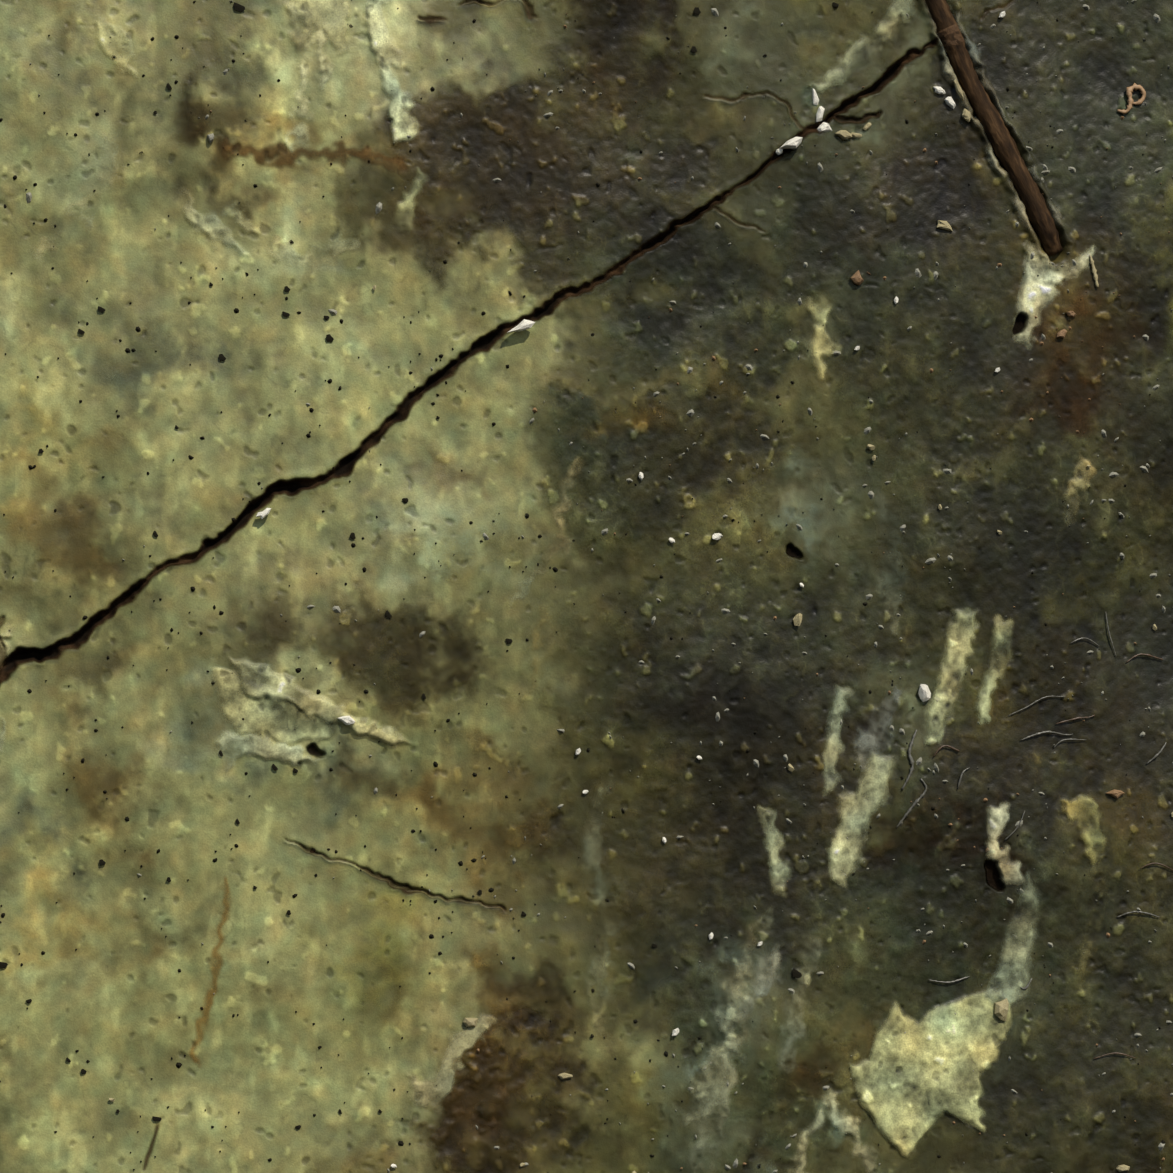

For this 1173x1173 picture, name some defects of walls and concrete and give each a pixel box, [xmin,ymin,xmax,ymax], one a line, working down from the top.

crack [418,0,537,23]
damp [166,66,211,143]
rust [222,138,406,170]
spalling [1012,247,1094,341]
crack [0,37,939,684]
damp [347,0,1173,1173]
damp [316,598,479,714]
spalling [213,661,402,763]
crack [286,839,506,911]